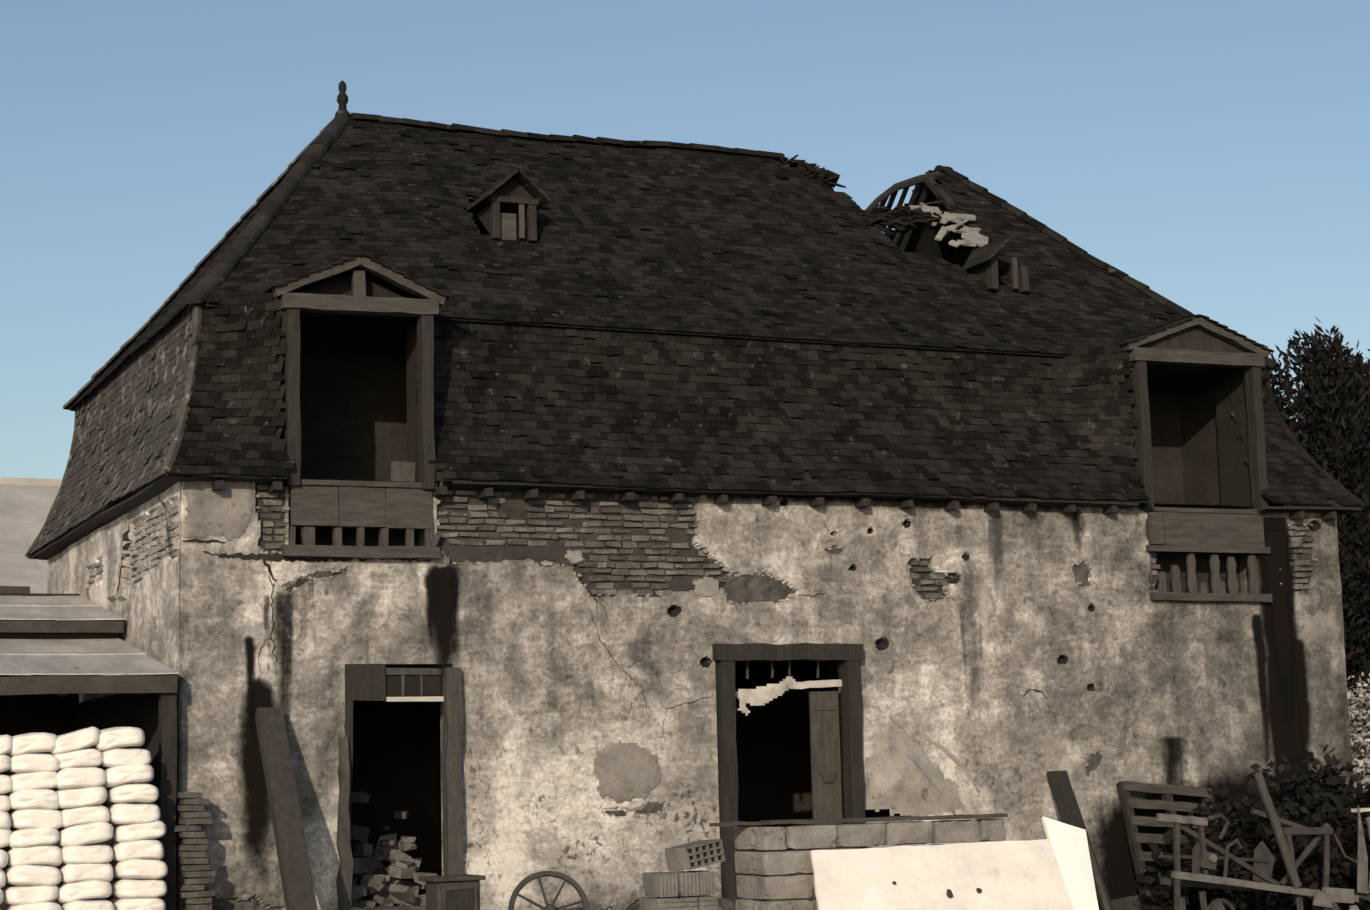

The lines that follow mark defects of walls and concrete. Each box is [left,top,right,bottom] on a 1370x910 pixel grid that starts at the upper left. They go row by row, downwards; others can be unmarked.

flaking render [129,500,179,589]
flaking render [256,479,290,554]
damp [426,565,458,672]
flaking render [433,479,801,617]
flaking render [907,554,969,603]